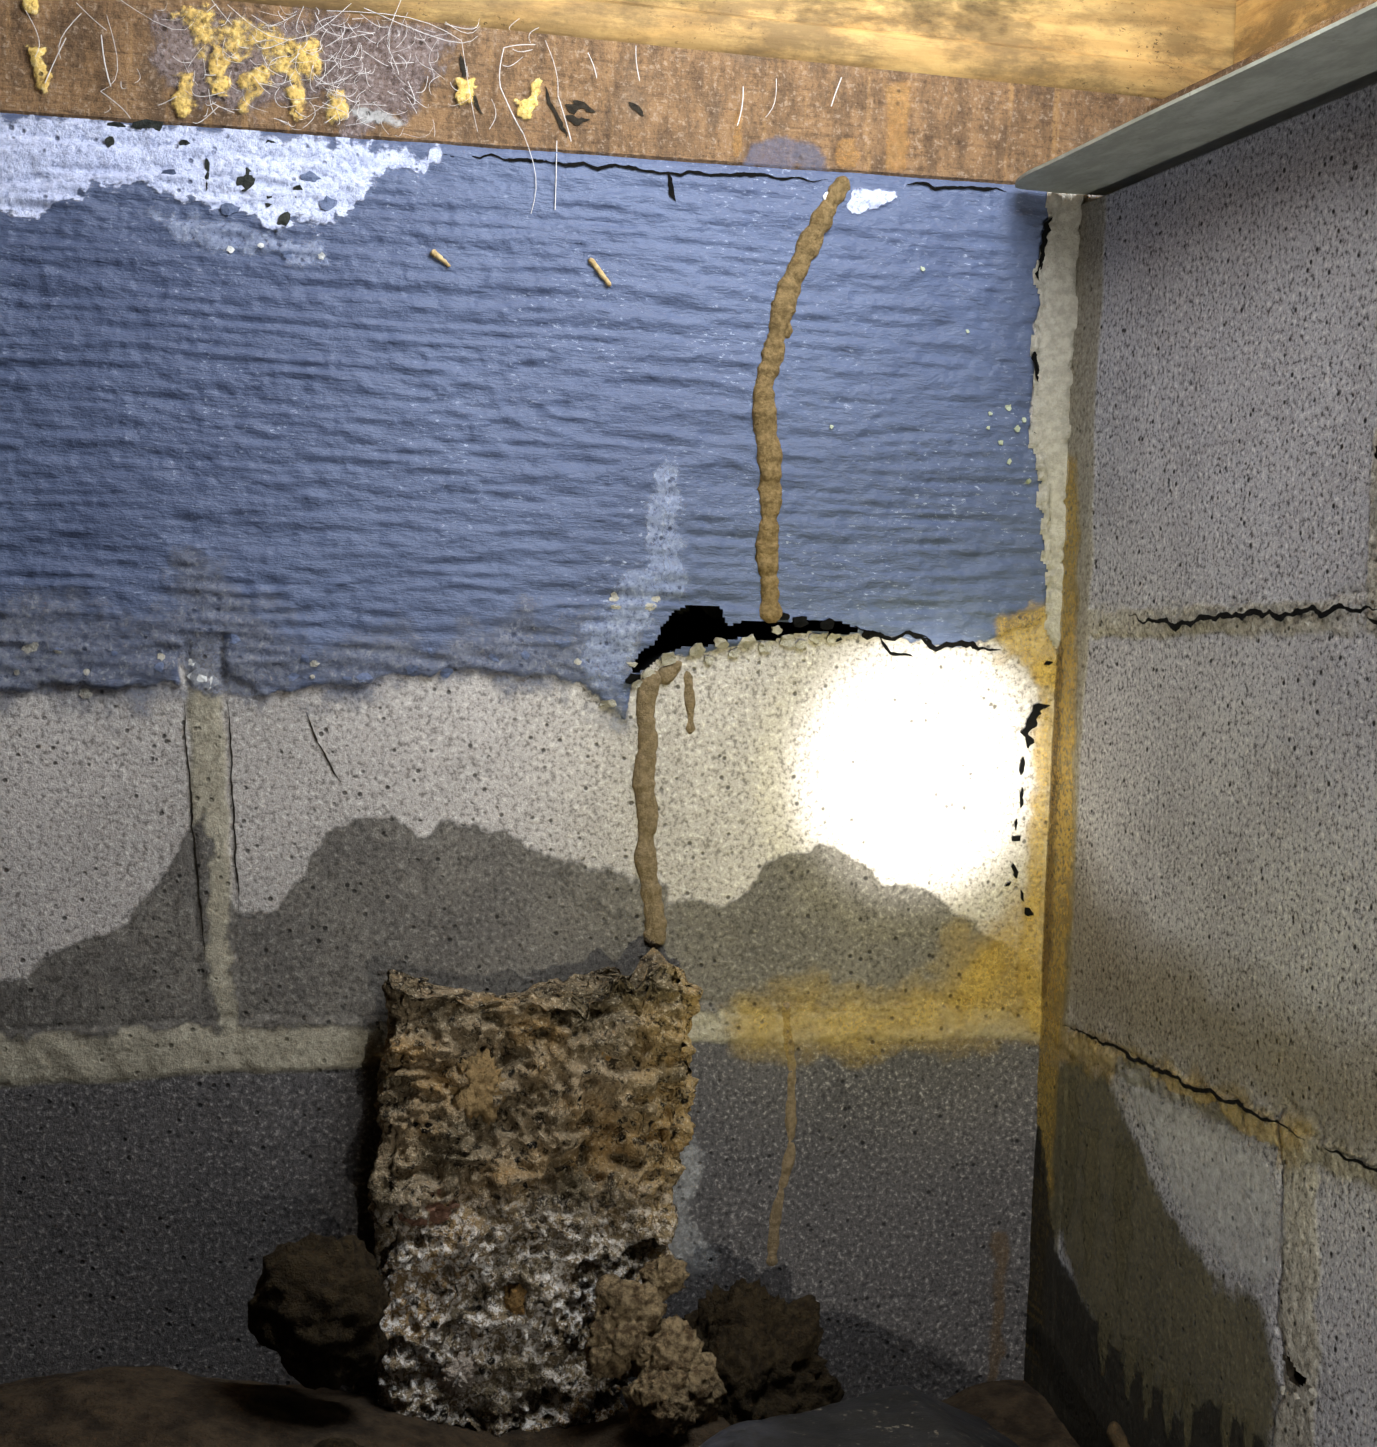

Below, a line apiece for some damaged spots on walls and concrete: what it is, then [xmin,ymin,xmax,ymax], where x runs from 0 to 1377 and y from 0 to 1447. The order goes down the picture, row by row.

peeling [0,115,442,266]
crack [854,626,1000,657]
crack [1128,603,1377,632]
leakage [0,813,1043,1040]
crack [1063,1025,1377,1172]
leakage [1024,1055,1281,1447]